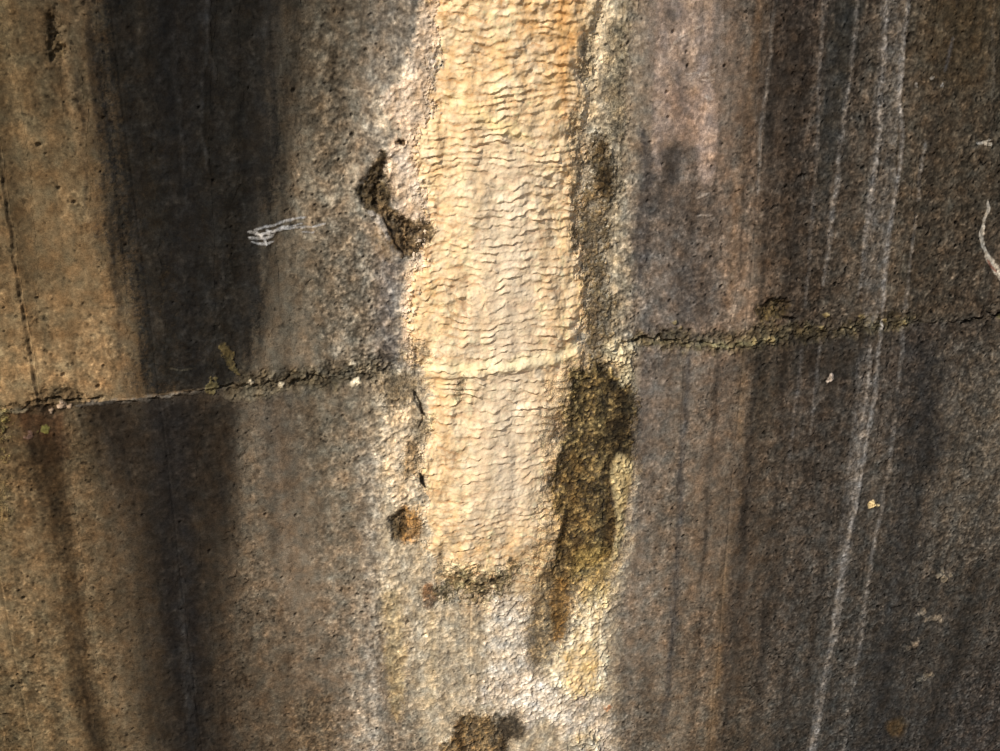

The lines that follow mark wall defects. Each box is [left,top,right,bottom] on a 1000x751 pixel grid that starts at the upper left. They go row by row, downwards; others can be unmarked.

water stain [63,0,305,751]
spalling [353,138,439,266]
spalling [386,503,425,547]
water stain [351,0,720,751]
water stain [687,0,1000,751]
crack [913,311,1000,327]